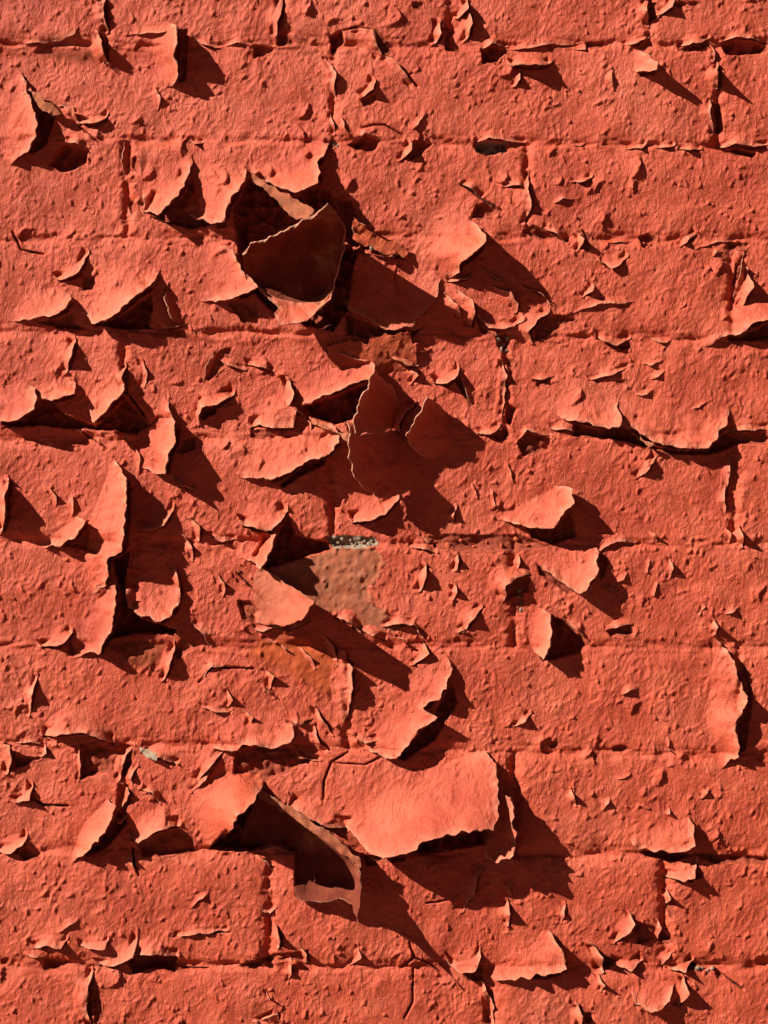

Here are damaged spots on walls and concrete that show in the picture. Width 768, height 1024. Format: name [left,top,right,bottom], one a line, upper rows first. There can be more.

peeling [0,29,768,683]
peeling [0,497,517,928]
peeling [698,605,752,770]
peeling [347,941,362,965]
peeling [445,900,567,1024]